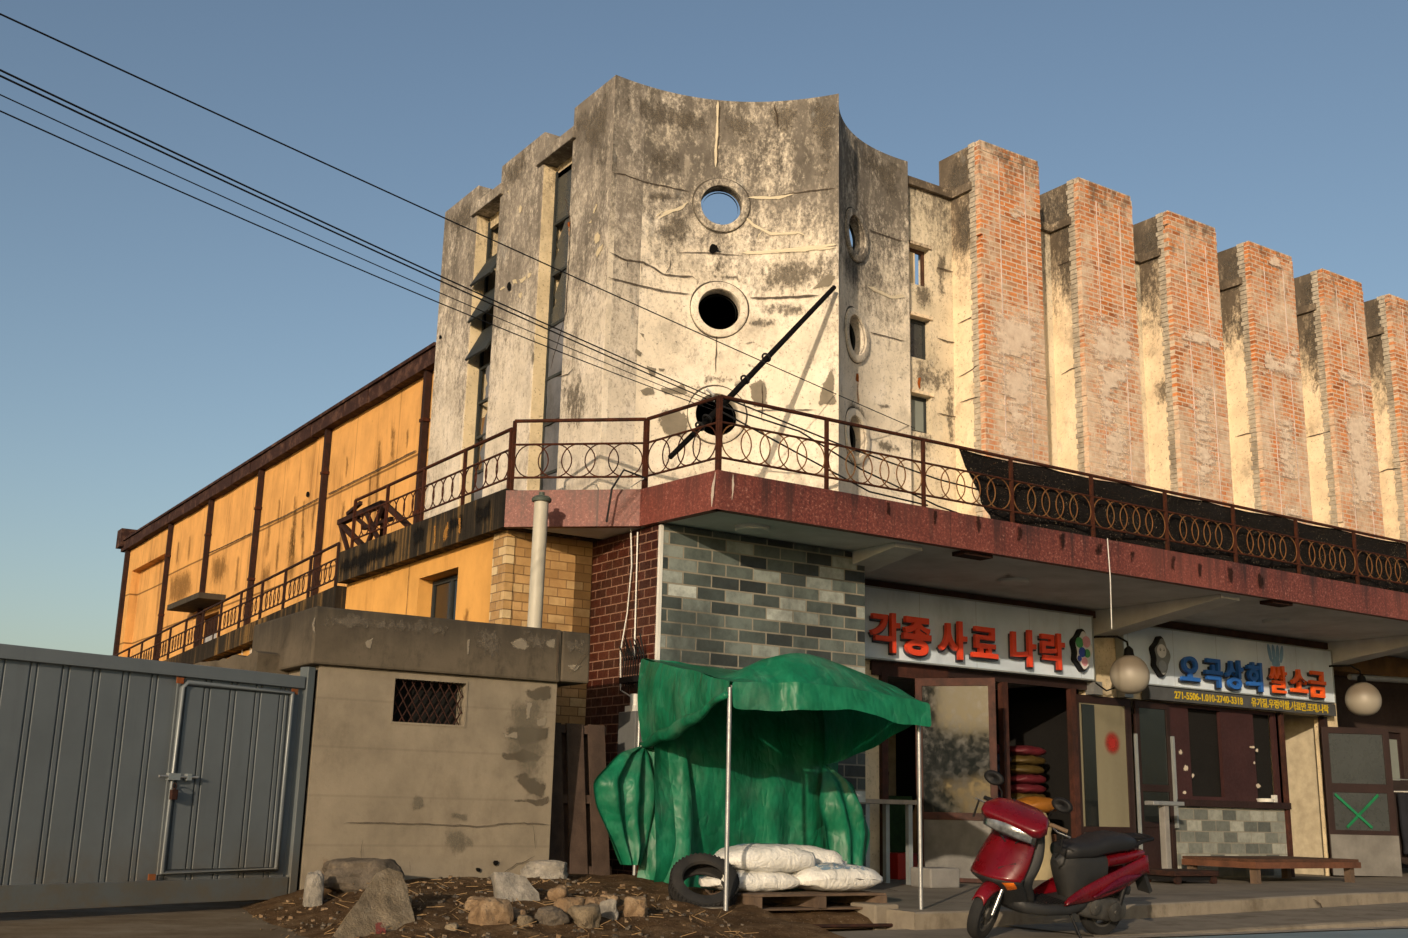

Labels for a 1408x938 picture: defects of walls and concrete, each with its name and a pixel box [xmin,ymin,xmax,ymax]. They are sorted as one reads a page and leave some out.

water stain [627,99,705,129]
water stain [655,217,690,242]
water stain [747,256,827,344]
water stain [563,377,585,424]
peeling [991,313,1038,457]
peeling [1093,313,1133,478]
peeling [1190,385,1215,481]
peeling [1263,345,1299,378]
peeling [1343,411,1376,511]
water stain [340,541,397,575]
water stain [450,502,490,530]
peeling [502,686,551,806]